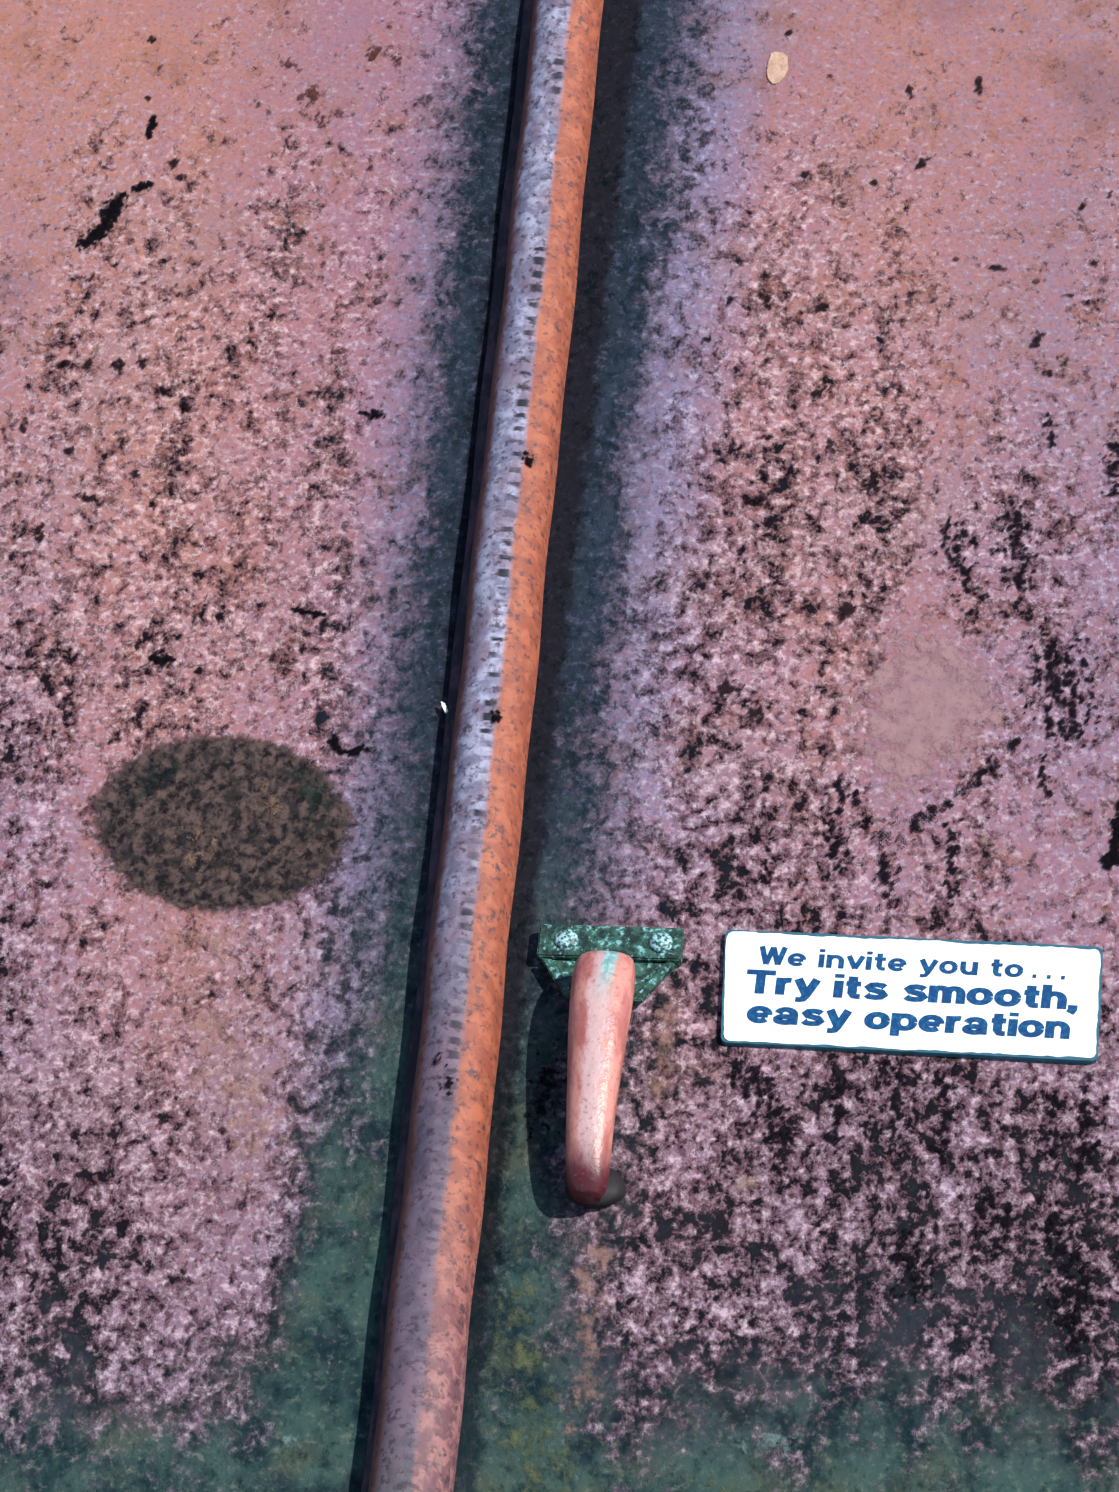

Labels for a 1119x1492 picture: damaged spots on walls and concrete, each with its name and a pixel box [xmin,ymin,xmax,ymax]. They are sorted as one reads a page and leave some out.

corrosion [57,354,95,373]
corrosion [112,357,147,372]
corrosion [1029,330,1046,348]
corrosion [832,598,858,623]
corrosion [707,676,771,724]
water stain [327,728,376,756]
water stain [92,734,354,913]
crack [1099,800,1119,871]
water stain [1041,1071,1102,1183]
water stain [0,1143,44,1275]
water stain [867,1224,942,1303]
water stain [969,1186,1119,1363]